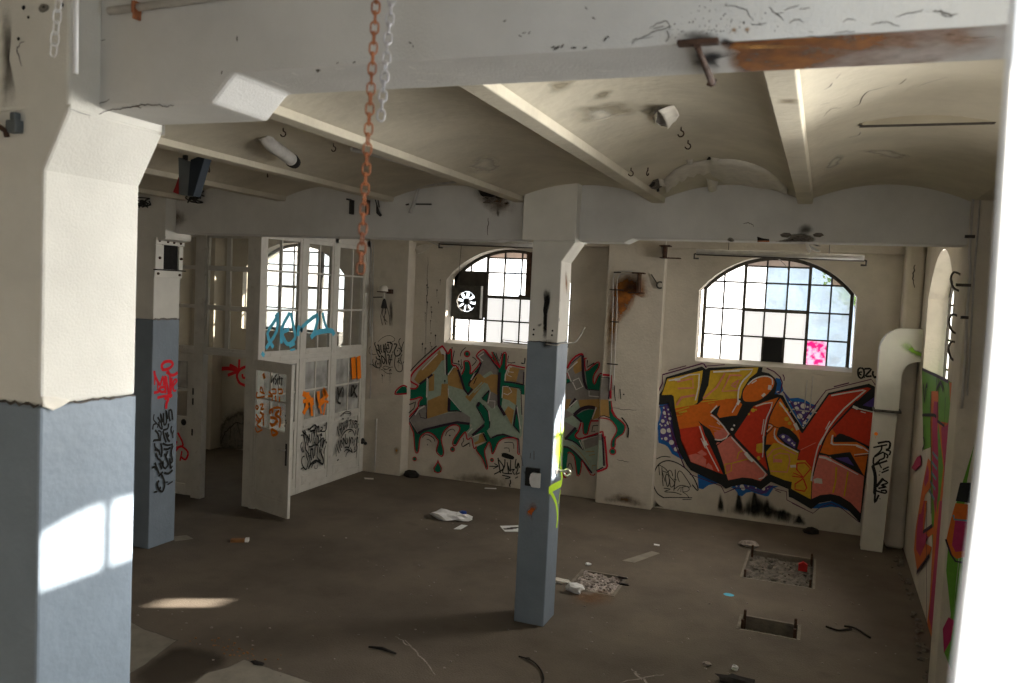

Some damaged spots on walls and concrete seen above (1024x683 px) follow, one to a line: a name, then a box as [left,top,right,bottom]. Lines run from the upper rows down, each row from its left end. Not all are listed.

crack [724,5,996,39]
corrosion [726,29,930,72]
crack [72,99,174,118]
crack [822,77,996,137]
corrosion [609,277,644,337]